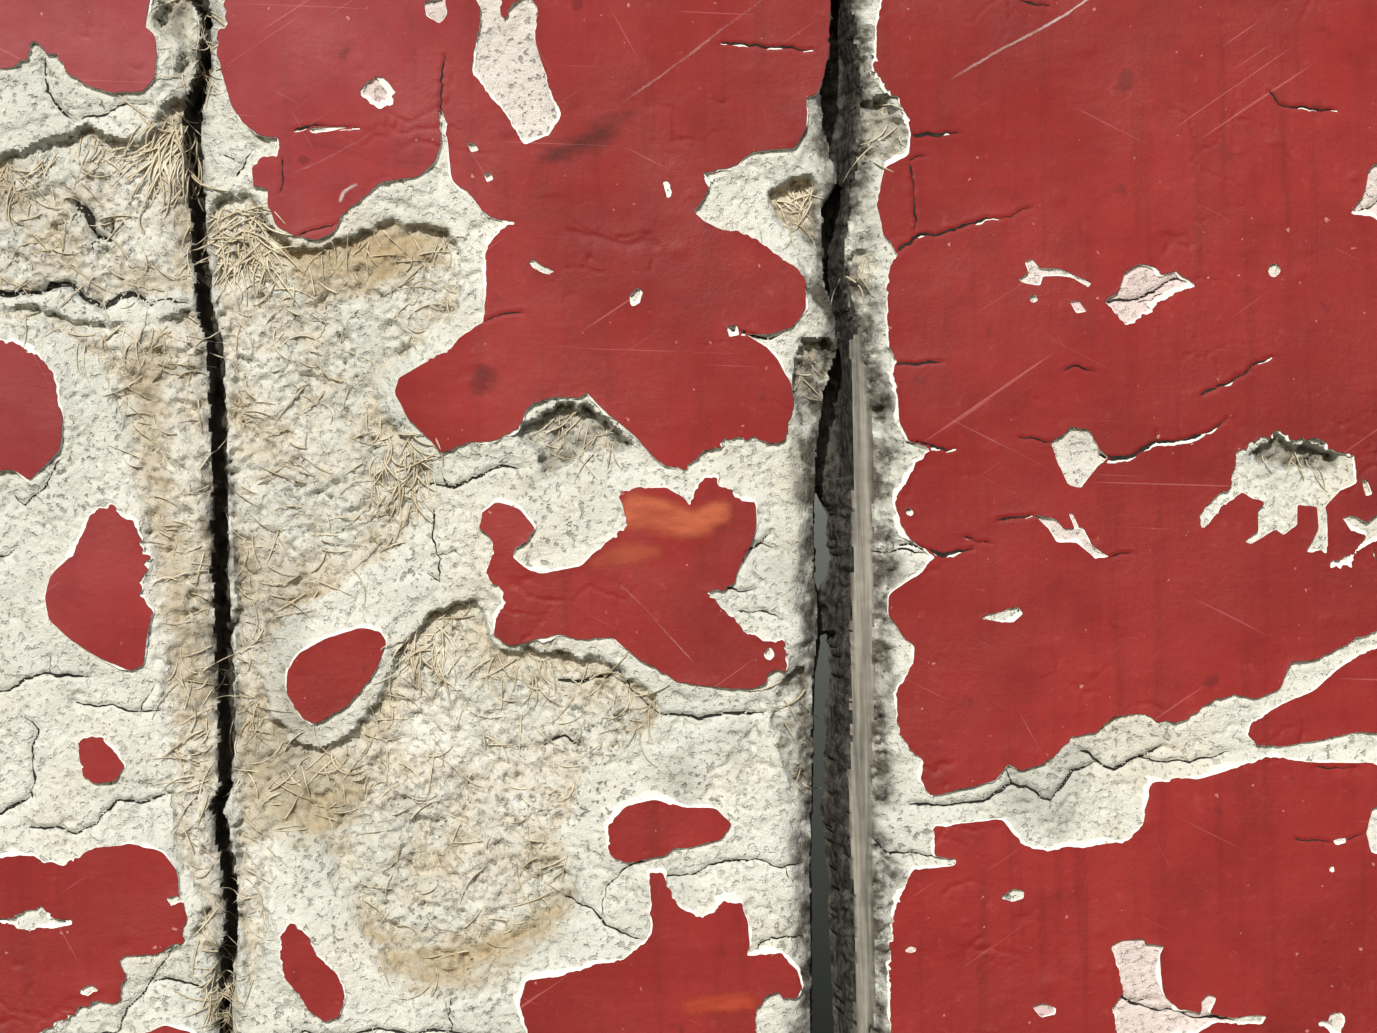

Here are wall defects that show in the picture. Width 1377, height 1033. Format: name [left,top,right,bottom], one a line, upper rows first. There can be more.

crack [0,0,360,1033]
crack [356,996,461,1033]
peeling [0,0,840,1033]
crack [438,55,446,110]
peeling [841,0,1377,1033]